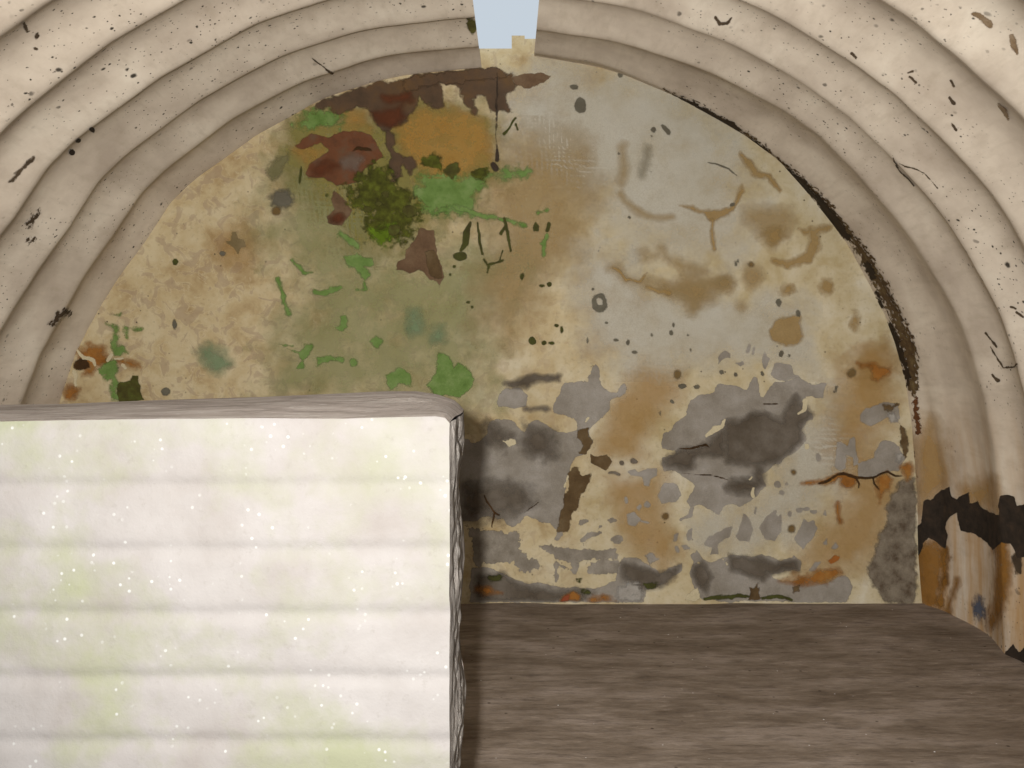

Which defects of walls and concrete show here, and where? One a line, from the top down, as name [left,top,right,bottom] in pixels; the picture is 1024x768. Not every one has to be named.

spalling [296,131,383,226]
spalling [396,228,444,285]
leakage [641,124,671,176]
leakage [687,188,744,250]
rust [663,87,922,435]
leakage [772,225,831,269]
peeling [459,344,852,603]
crack [803,470,900,524]
spalling [835,402,917,604]
rust [917,487,1024,629]